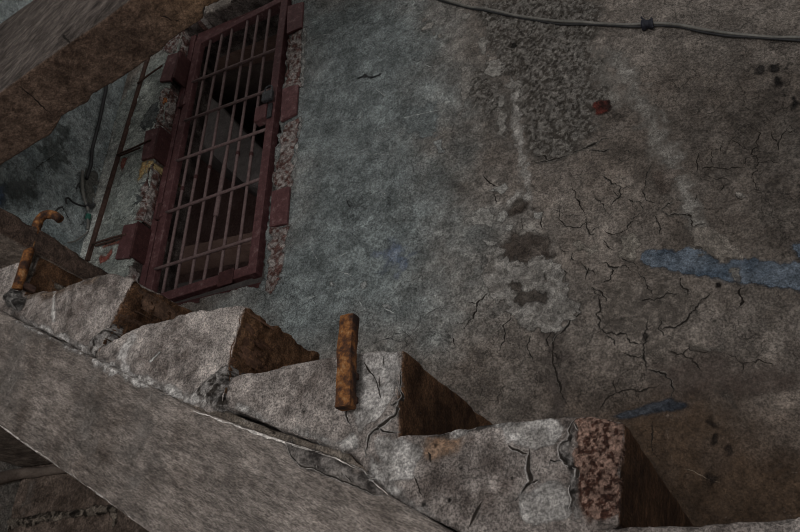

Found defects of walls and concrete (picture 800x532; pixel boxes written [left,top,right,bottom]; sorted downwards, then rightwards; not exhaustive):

spalling [284,28,307,88]
spalling [273,117,303,190]
crack [532,136,632,163]
crack [696,124,795,200]
spalling [265,224,291,294]
crack [447,294,487,346]
crack [499,166,773,519]
crack [364,332,410,458]
peeling [374,436,422,481]
spalling [432,398,687,525]